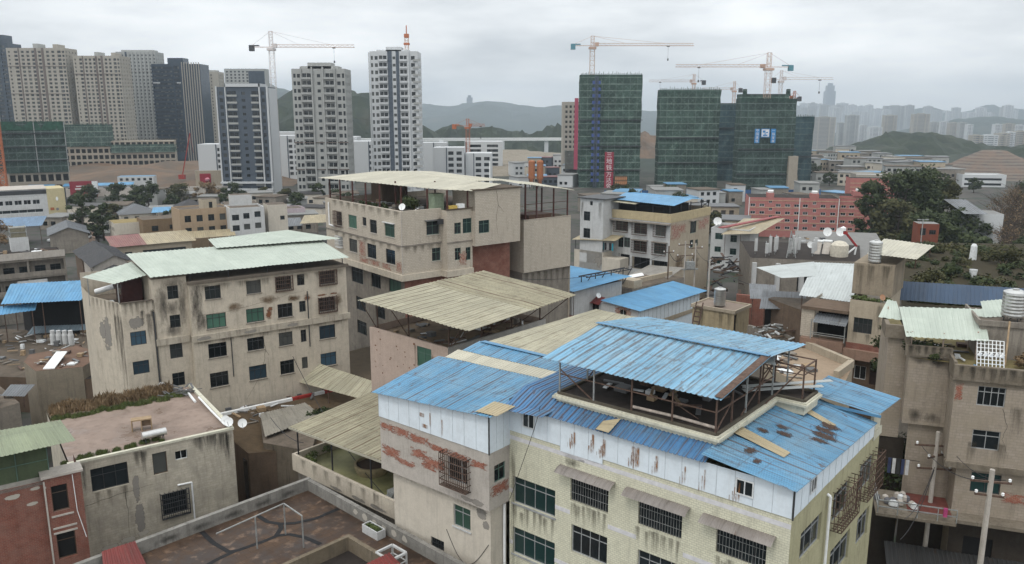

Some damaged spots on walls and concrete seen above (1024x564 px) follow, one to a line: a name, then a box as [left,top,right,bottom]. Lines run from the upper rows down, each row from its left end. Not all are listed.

peeling [99,317,112,351]
peeling [380,422,487,472]
rust [758,424,792,437]
rust [811,422,840,444]